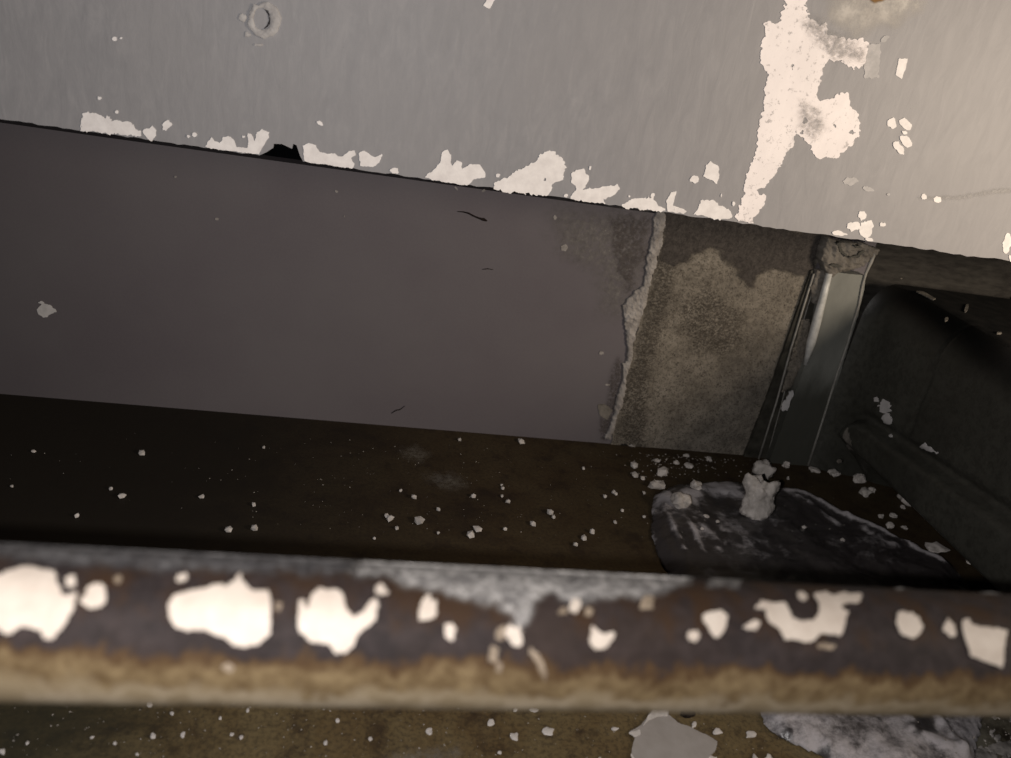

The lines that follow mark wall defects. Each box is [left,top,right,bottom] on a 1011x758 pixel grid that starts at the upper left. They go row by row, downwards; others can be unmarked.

peeling [80,110,172,141]
peeling [205,129,269,154]
peeling [303,143,382,169]
spalling [425,0,889,455]
leakage [660,212,828,287]
peeling [0,565,122,639]
peeling [168,572,282,647]
peeling [298,583,389,654]
peeling [558,599,615,649]
peeling [687,610,728,642]
peeling [743,591,862,650]
peeling [943,618,1007,668]